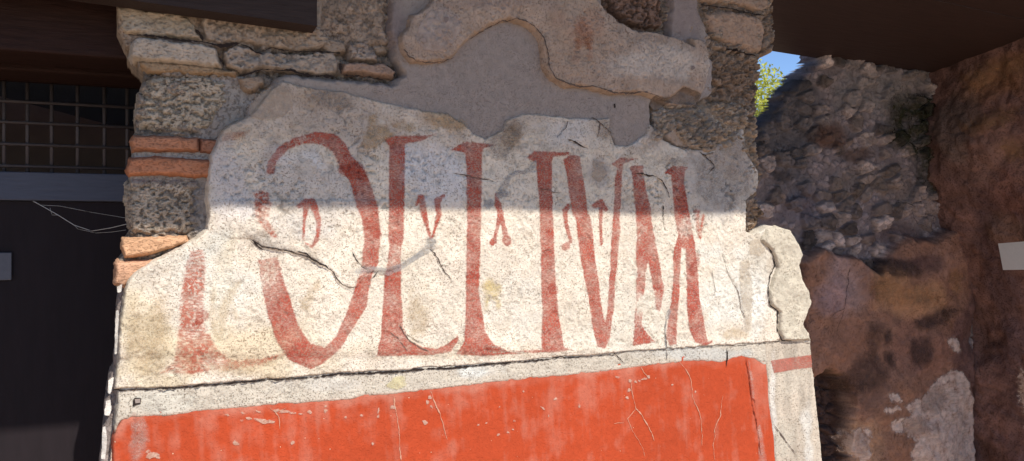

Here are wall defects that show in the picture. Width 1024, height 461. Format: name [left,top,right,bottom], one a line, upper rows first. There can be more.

spalling [650,87,701,110]
crack [113,239,794,458]